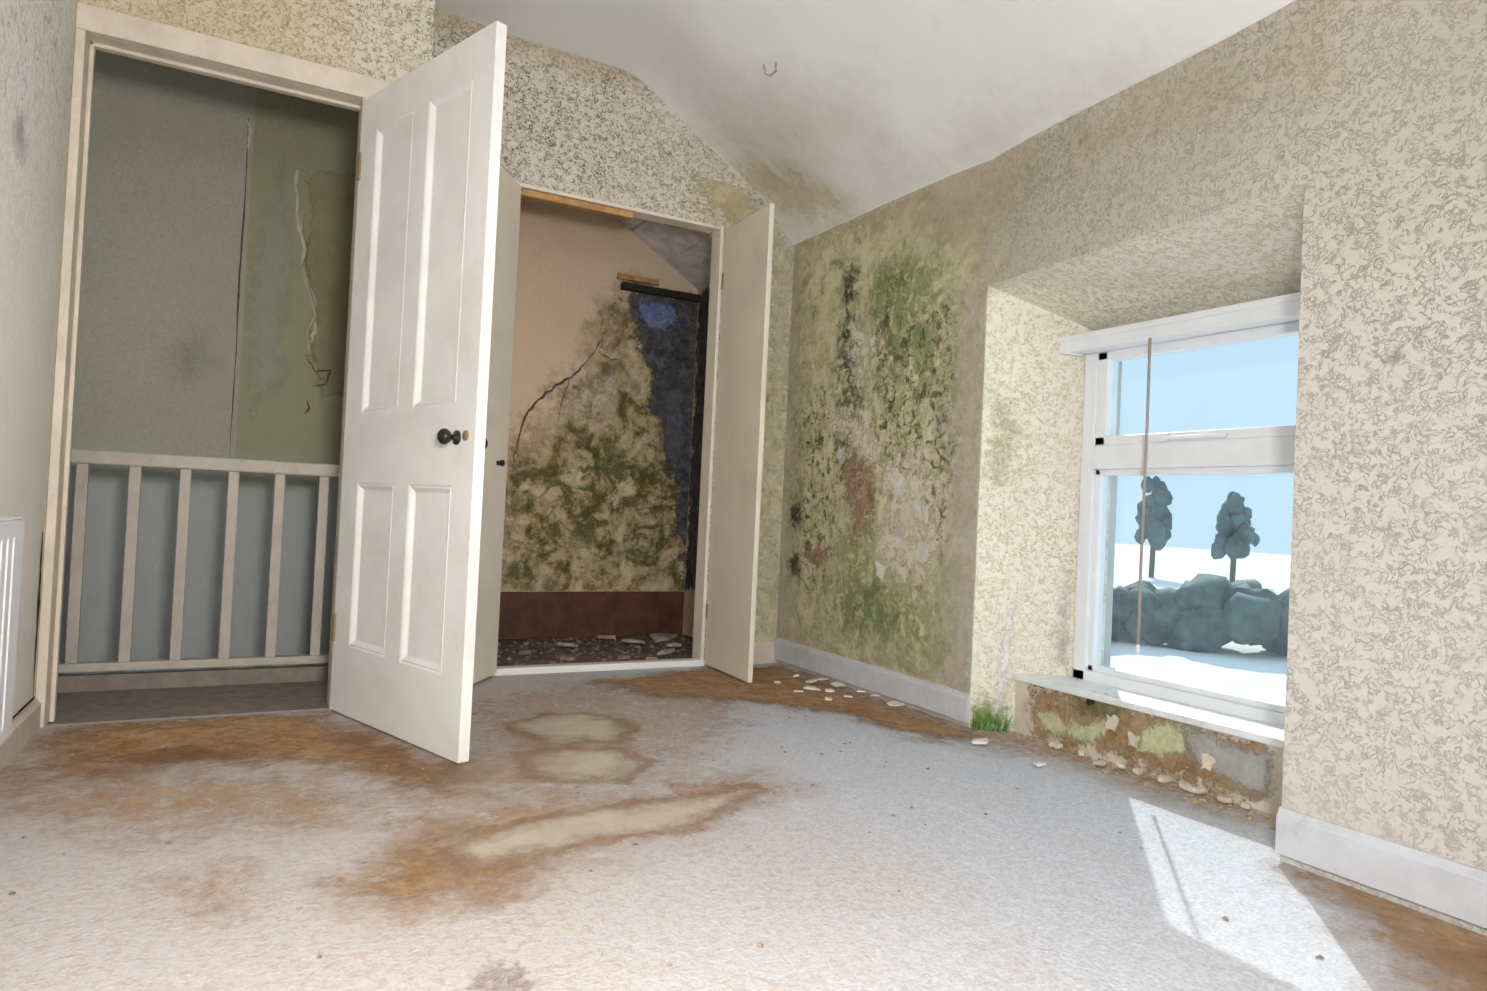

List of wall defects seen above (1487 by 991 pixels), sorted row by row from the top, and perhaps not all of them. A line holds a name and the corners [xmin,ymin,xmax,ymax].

flaking render [628,287,710,591]
leakage [754,197,985,691]
peeling [1029,684,1274,803]